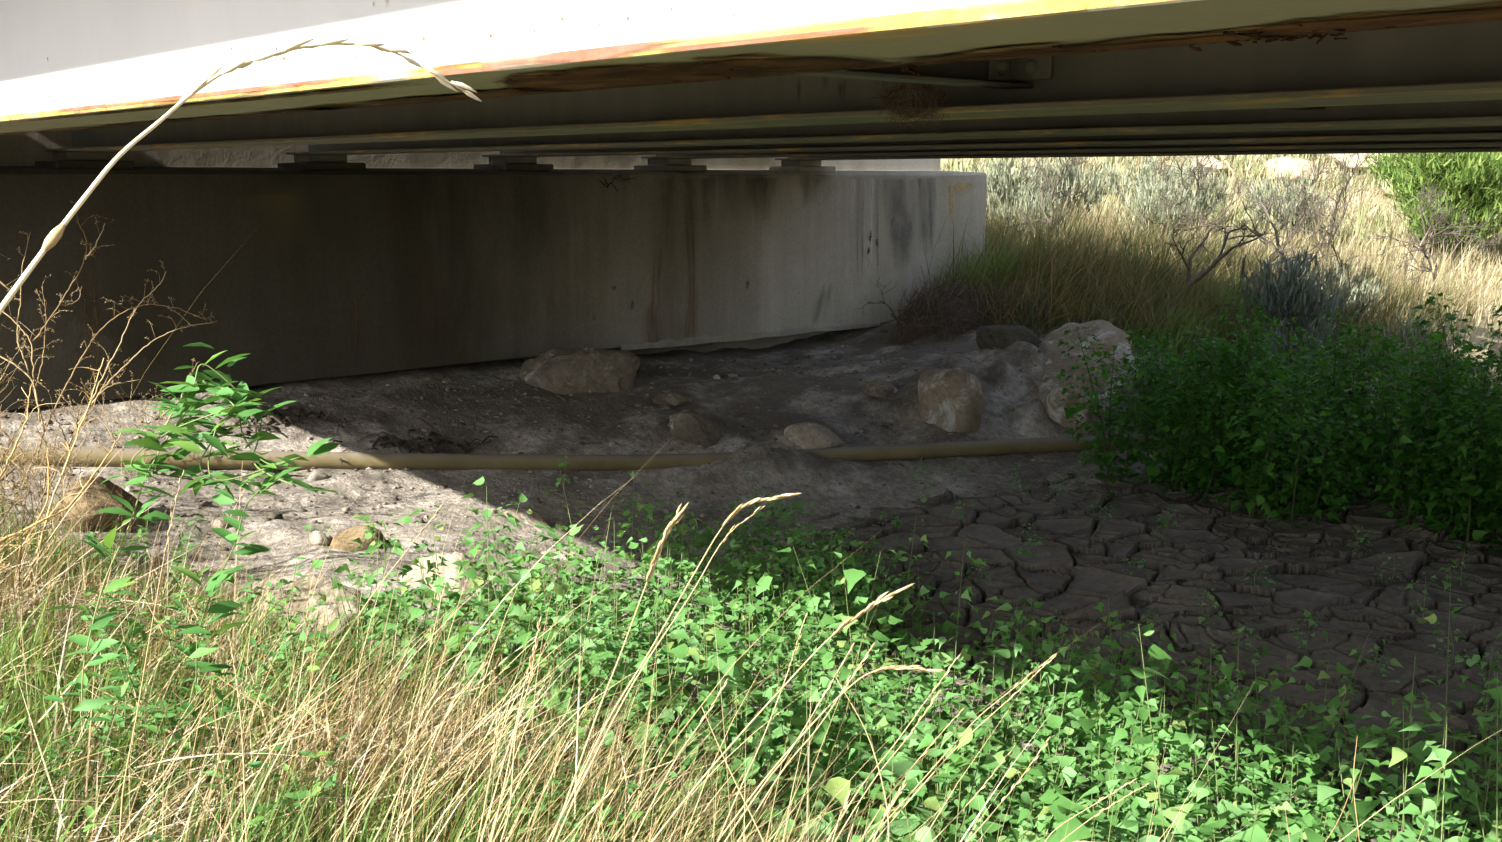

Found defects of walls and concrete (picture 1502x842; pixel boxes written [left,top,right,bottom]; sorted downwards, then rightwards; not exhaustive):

corrosion [0,0,1502,135]